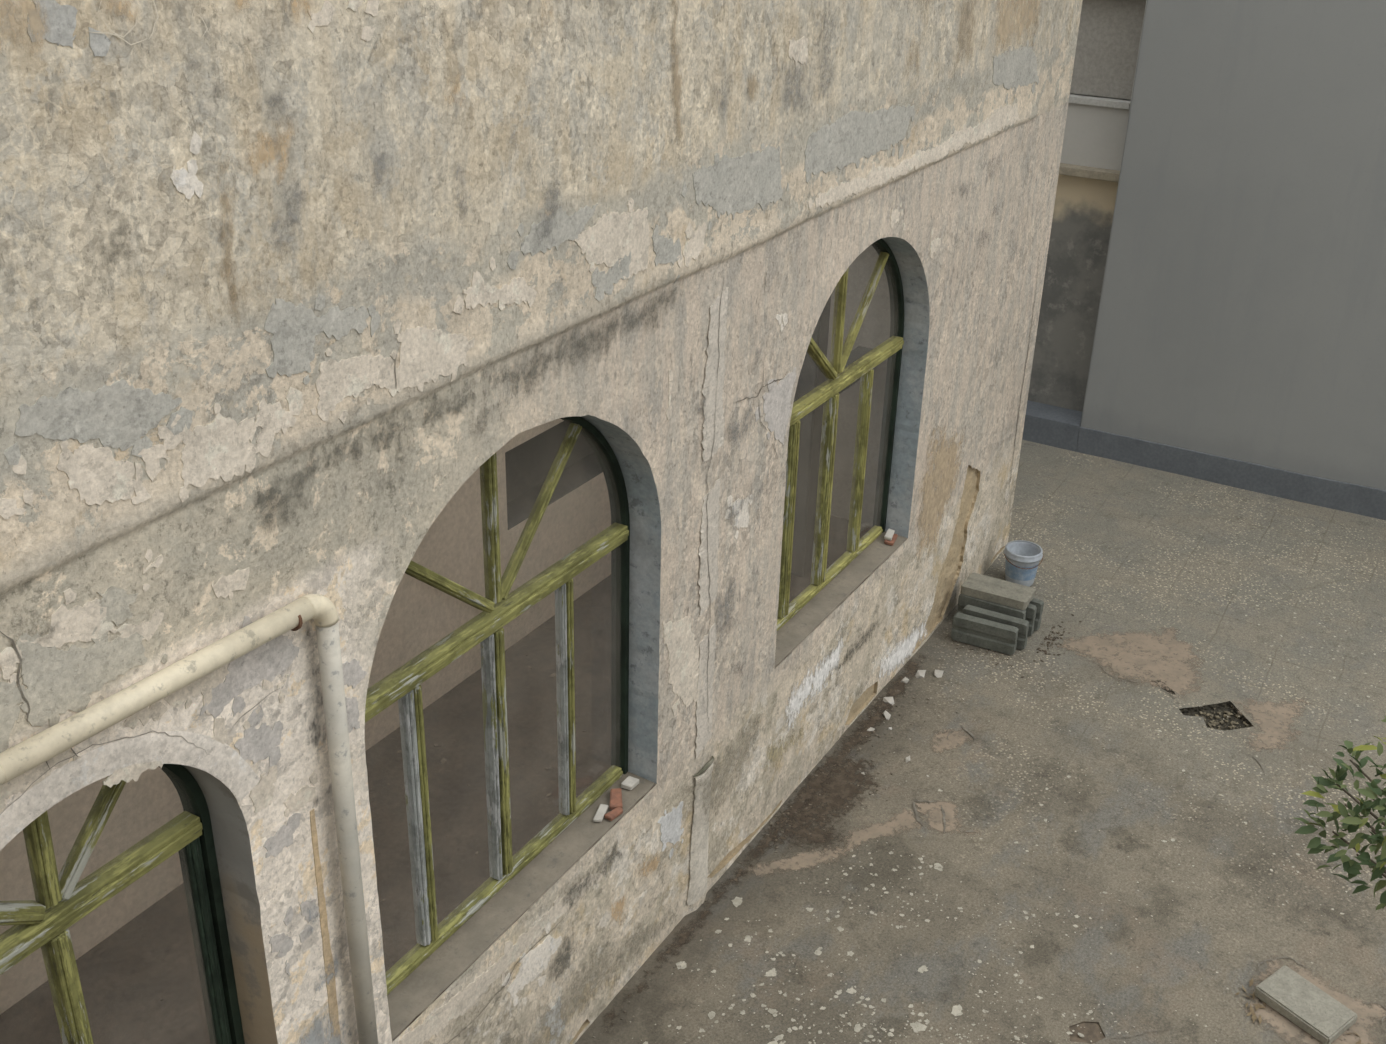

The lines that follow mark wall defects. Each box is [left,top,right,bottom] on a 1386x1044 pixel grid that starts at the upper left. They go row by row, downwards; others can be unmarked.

peeling [808,33,1040,209]
peeling [56,320,475,506]
peeling [452,198,707,314]
leakage [496,289,676,393]
peeling [701,287,728,462]
crack [0,631,30,722]
peeling [102,761,163,788]
peeling [662,478,754,759]
leakage [700,625,875,814]
spalling [845,681,895,730]
spalling [901,465,980,683]